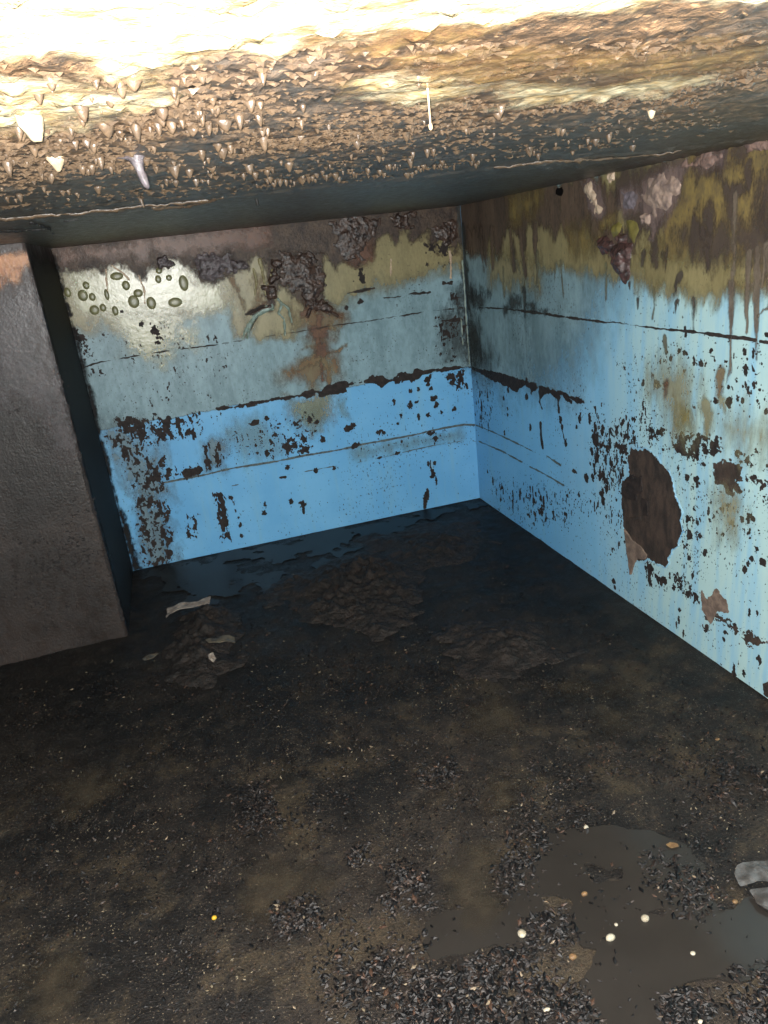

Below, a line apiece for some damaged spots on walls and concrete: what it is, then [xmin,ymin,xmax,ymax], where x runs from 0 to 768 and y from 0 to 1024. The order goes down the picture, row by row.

leakage [0,0,659,134]
leakage [501,76,720,108]
peeling [72,327,106,382]
corrosion [281,307,349,425]
leakage [53,141,768,570]
peeling [104,320,326,567]
peeling [343,422,362,450]
peeling [487,329,768,666]